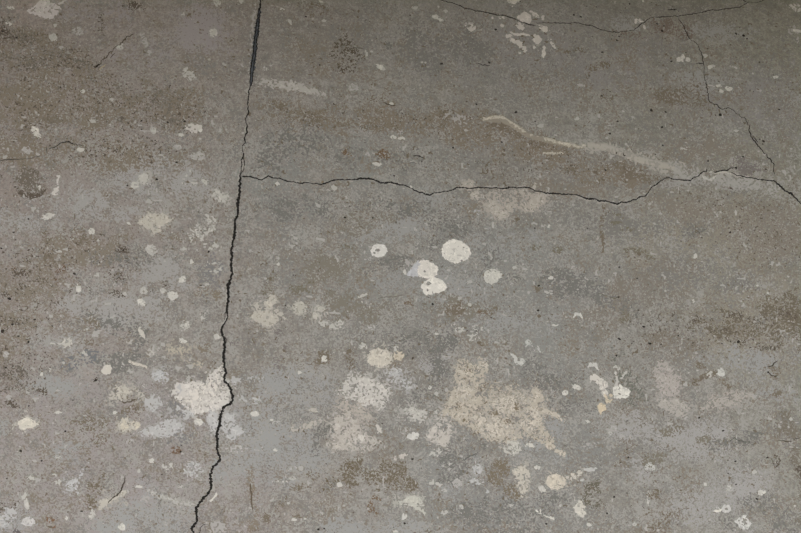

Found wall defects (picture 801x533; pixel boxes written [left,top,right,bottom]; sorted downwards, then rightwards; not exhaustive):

crack [190,0,801,533]